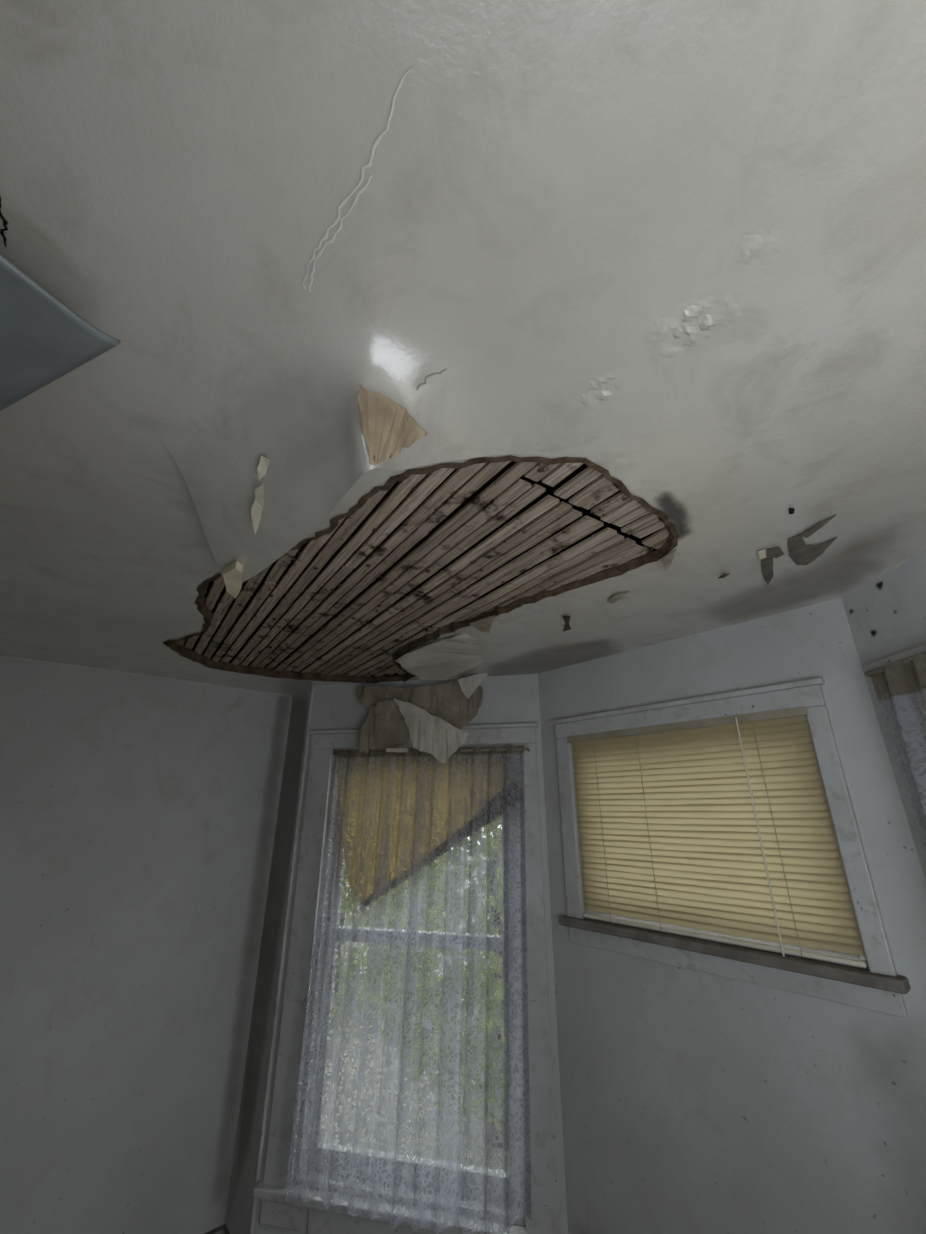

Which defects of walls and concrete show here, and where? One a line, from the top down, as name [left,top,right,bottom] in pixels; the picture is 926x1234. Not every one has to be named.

crack [302,65,416,292]
spalling [163,455,679,683]
peeling [758,515,837,585]